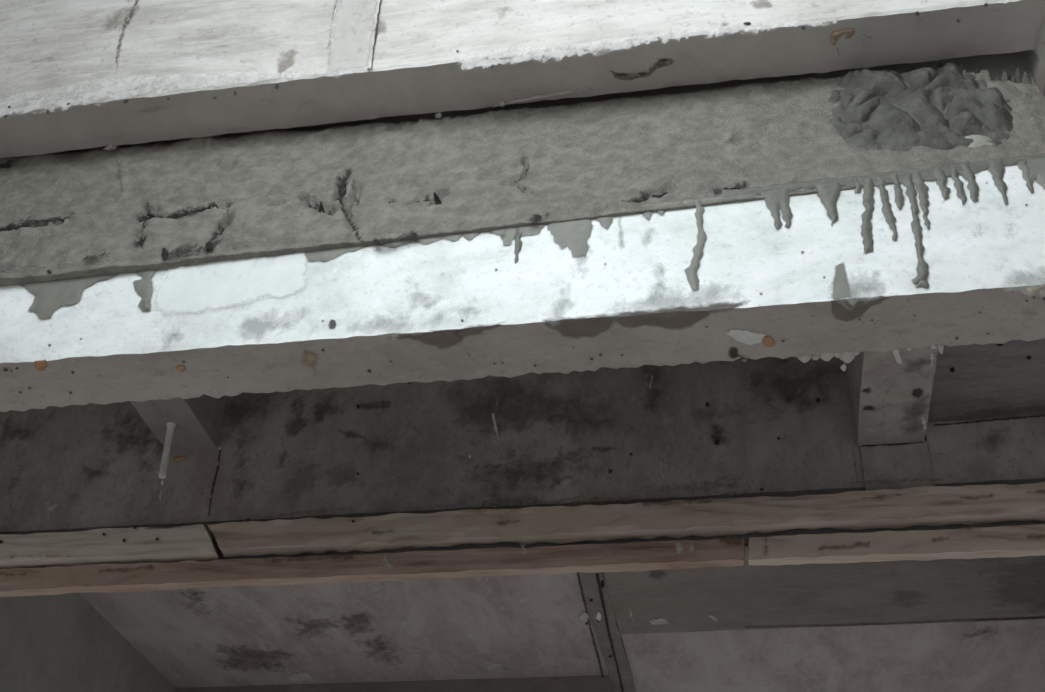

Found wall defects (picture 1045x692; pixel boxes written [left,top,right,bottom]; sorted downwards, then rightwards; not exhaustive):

crack [116,0,138,66]
crack [367,0,382,71]
crack [141,203,230,240]
crack [338,169,364,243]
damp [0,62,1045,338]